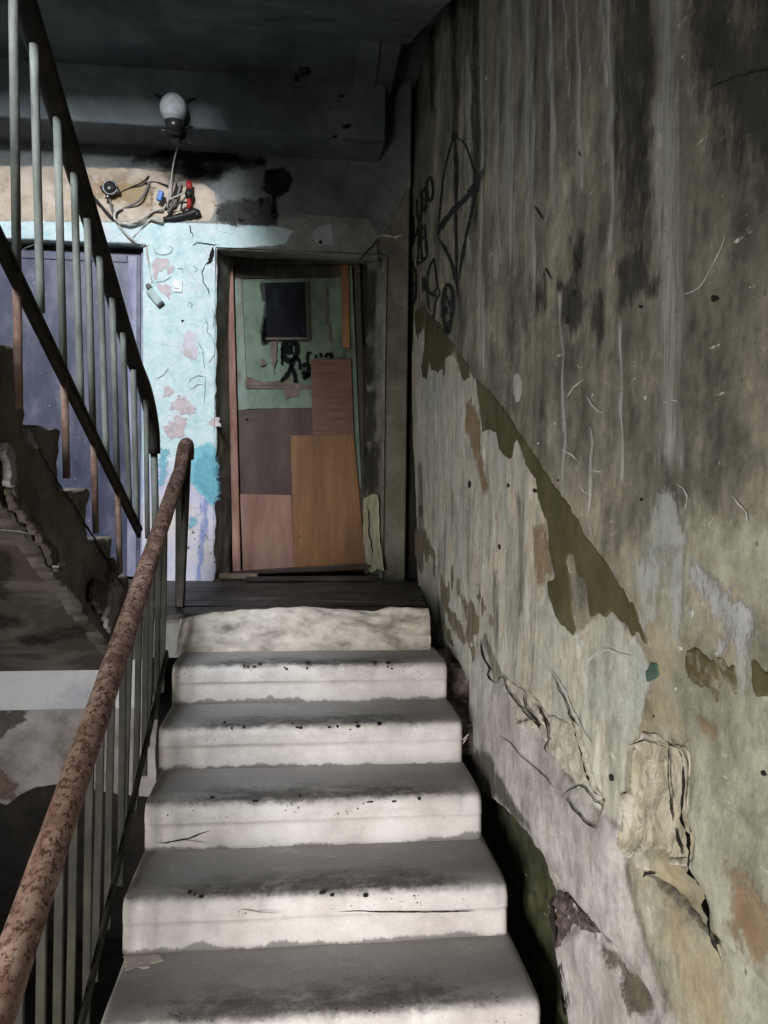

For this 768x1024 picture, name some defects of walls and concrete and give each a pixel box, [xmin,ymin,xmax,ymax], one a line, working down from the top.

damp [690,0,768,176]
damp [216,166,292,227]
damp [449,0,603,495]
damp [600,0,683,463]
flaking render [0,443,65,572]
flaking render [363,494,384,573]
peeling [421,311,647,646]
crack [480,642,505,683]
flaking render [677,557,768,703]
crack [500,667,606,830]
crack [157,830,210,844]
flaking render [549,883,611,951]